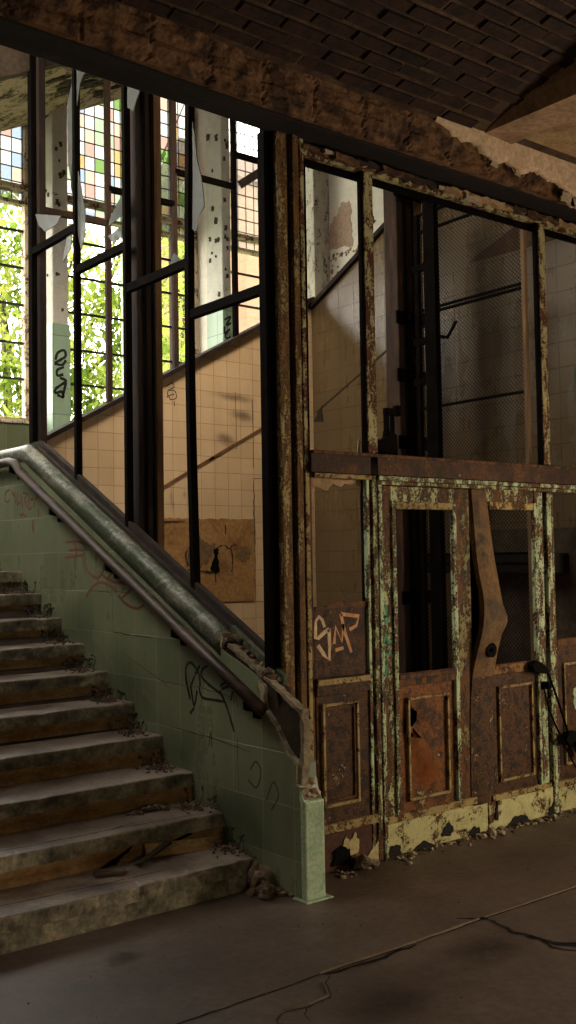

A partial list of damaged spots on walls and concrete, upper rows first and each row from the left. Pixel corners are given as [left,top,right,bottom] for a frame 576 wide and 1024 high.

peeling [329,200,358,279]
spalling [302,144,576,263]
spalling [435,117,576,209]
spalling [220,625,321,800]
peeling [343,822,454,860]
peeling [495,800,530,827]
crack [177,886,576,1024]